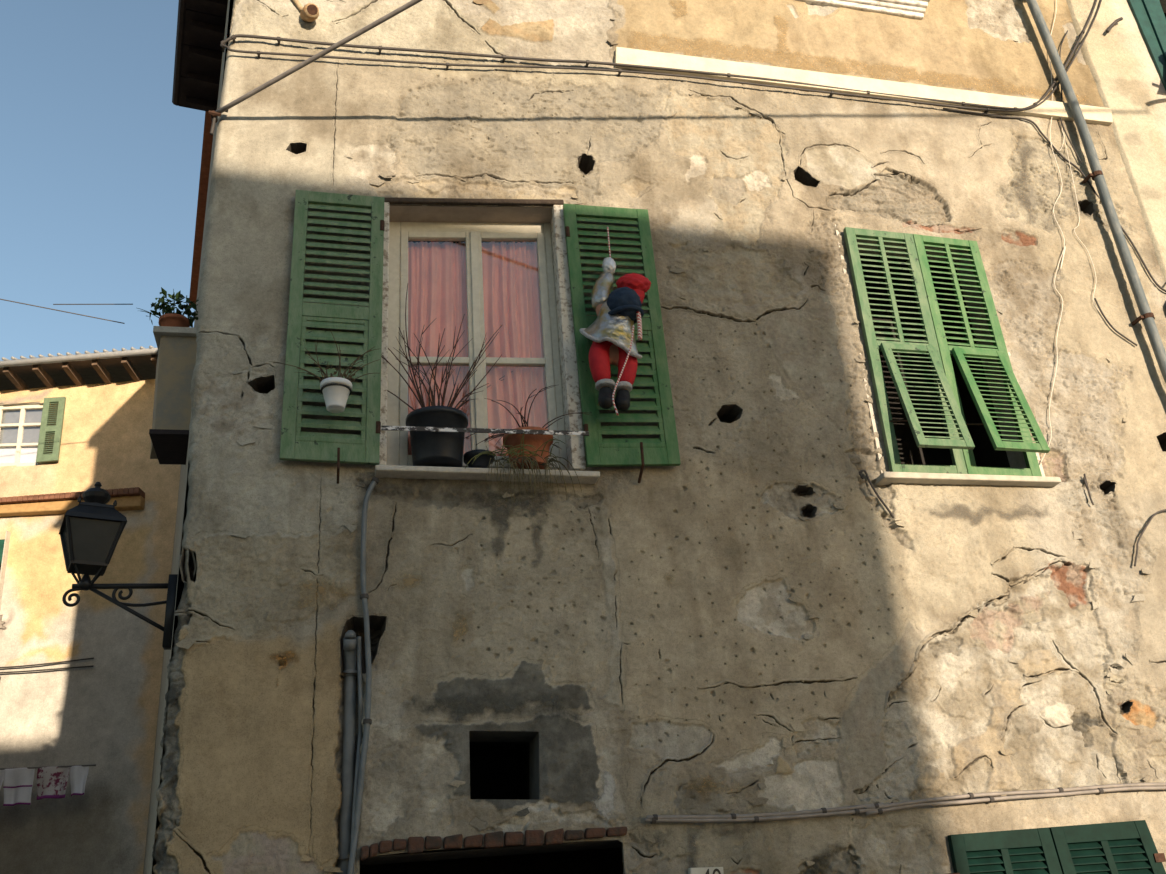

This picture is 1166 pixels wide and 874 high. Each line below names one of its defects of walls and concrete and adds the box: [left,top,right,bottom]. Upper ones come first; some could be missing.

crack [661,88,983,326]
crack [367,501,399,596]
crack [431,532,472,549]
flaking render [230,0,979,874]
flaking render [788,131,1166,874]
crack [884,545,1073,717]
leakage [415,694,579,722]
efflorescence [595,772,615,819]
crack [637,675,858,808]
crack [847,741,920,822]
crack [950,639,1166,784]